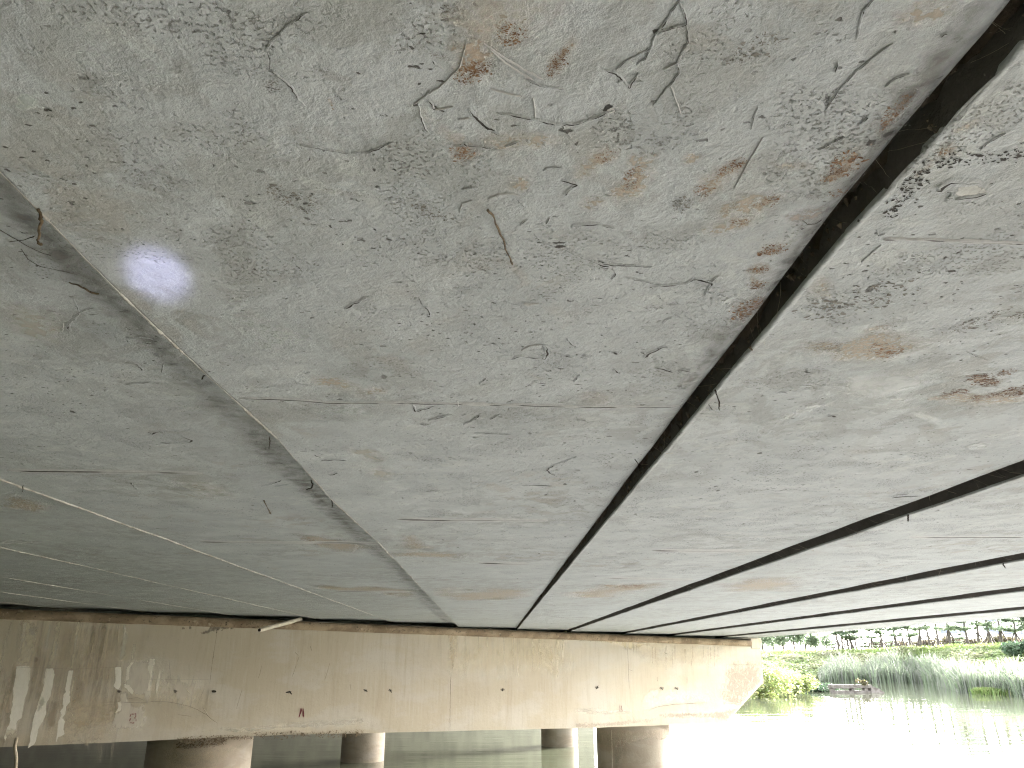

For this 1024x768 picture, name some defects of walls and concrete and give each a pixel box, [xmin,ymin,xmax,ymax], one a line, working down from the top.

crack [261,12,308,106]
rust [452,40,492,85]
rust [494,22,528,46]
rust [546,44,573,77]
crack [603,0,697,114]
crack [825,0,893,110]
rust [695,157,747,197]
rust [790,150,869,221]
rust [729,244,788,320]
rust [812,325,912,359]
rust [928,369,1024,403]